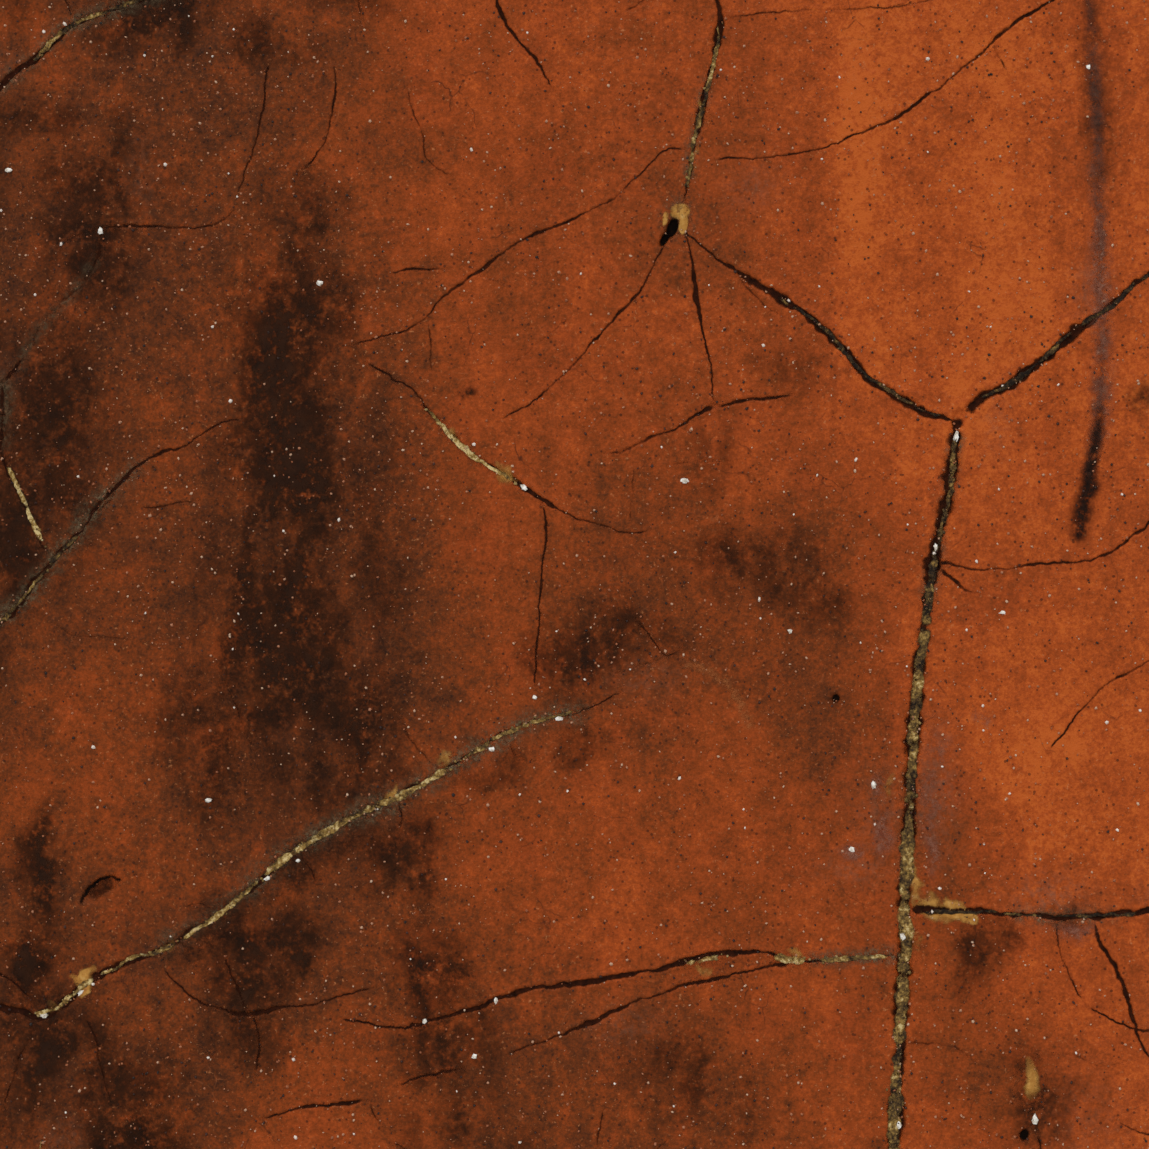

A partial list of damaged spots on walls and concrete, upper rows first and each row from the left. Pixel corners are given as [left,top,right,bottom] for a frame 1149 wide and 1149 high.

crack [0,0,145,91]
crack [239,66,269,188]
crack [308,71,337,165]
crack [87,219,224,277]
crack [358,0,1054,683]
damp [0,357,91,603]
damp [222,246,383,790]
damp [1073,378,1104,540]
crack [0,232,1149,1149]
damp [6,816,57,993]
damp [13,993,79,1102]
damp [207,911,316,1051]